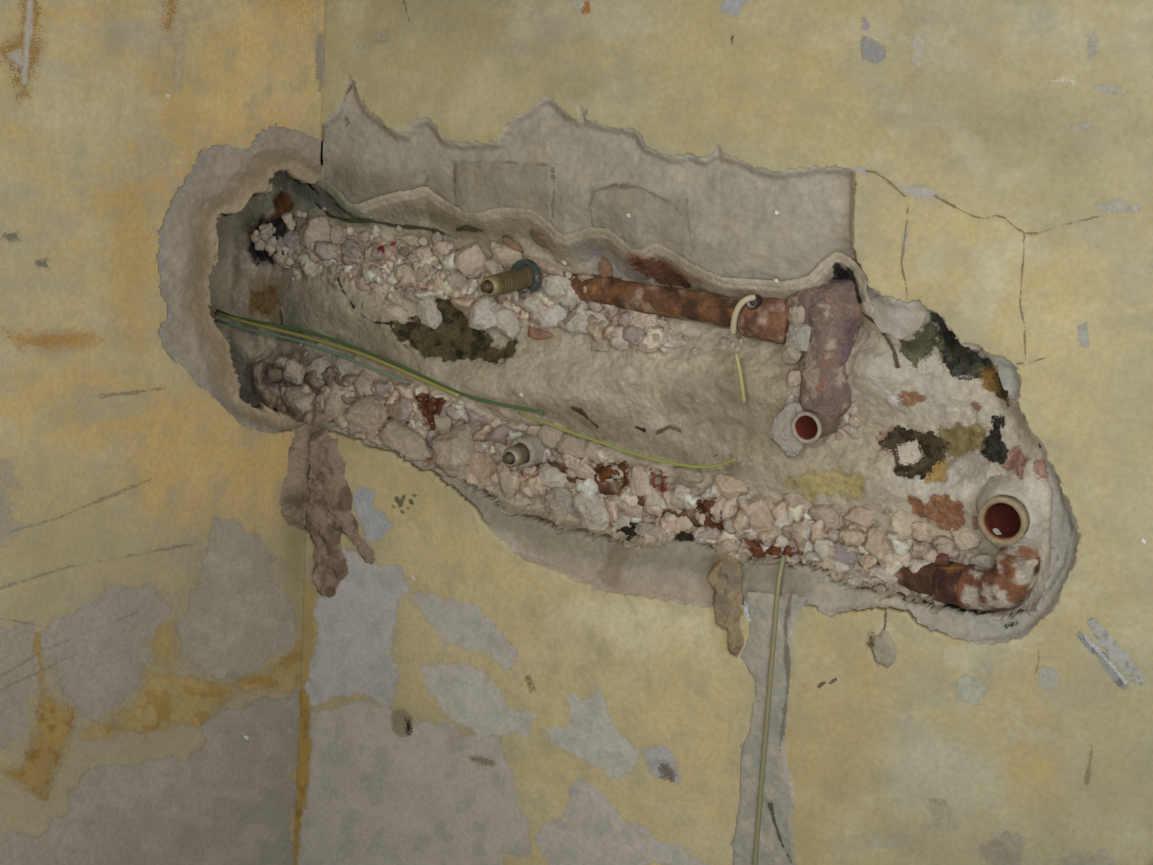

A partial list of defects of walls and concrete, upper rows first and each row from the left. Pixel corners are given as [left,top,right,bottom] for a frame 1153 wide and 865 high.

damp [0,0,48,104]
crack [851,165,1099,365]
spalling [157,77,1080,658]
damp [0,618,316,865]
peeling [640,743,681,784]
flaking render [867,628,897,669]